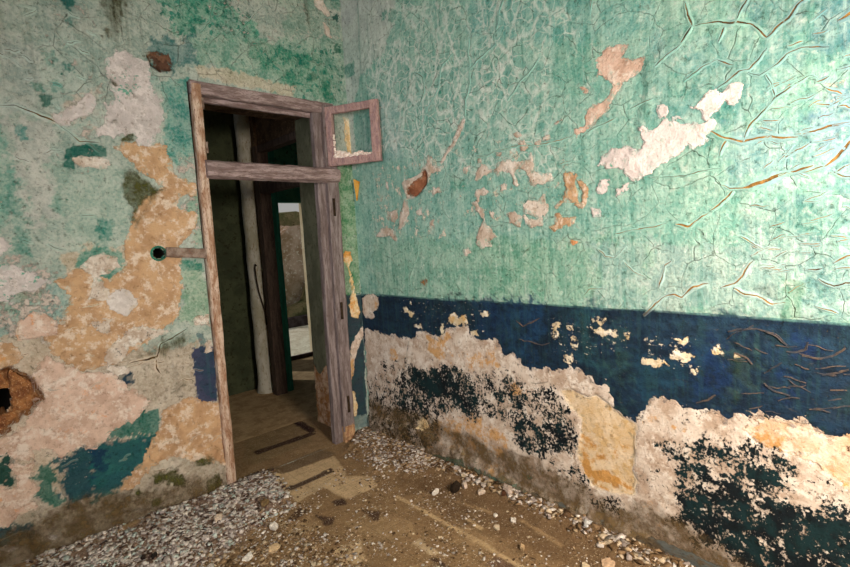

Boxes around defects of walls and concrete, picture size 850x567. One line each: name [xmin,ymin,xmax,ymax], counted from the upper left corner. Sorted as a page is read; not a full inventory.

crack [0,11,101,173]
damp [104,0,127,36]
peeling [375,119,465,242]
crack [414,0,504,136]
peeling [463,82,744,256]
peeling [574,44,645,138]
crack [615,0,850,317]
peeling [0,49,199,529]
peeling [120,396,226,492]
peeling [193,313,210,327]
peeling [343,251,850,567]
crack [726,325,850,414]